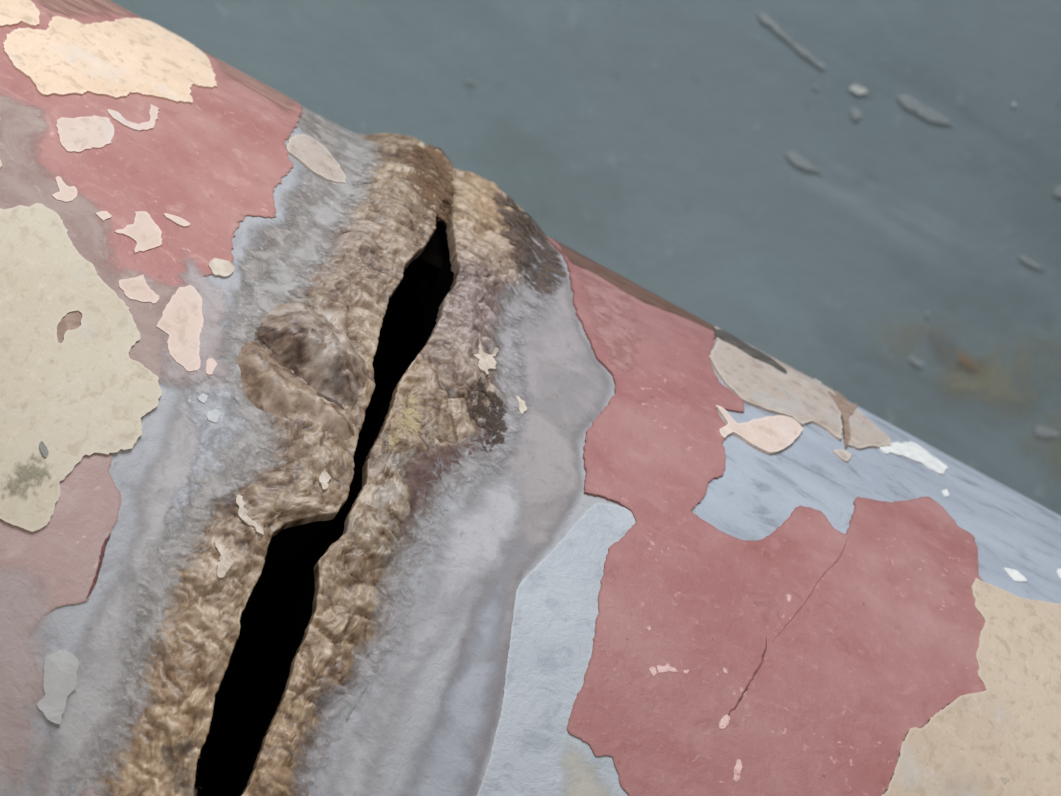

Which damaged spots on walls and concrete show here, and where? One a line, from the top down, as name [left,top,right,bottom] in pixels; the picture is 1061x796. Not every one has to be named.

damp [5,441,50,497]
peeling [0,0,346,792]
damp [35,105,384,796]
crack [238,387,396,796]
crack [388,201,453,363]
damp [295,229,609,796]
spalling [467,333,527,453]
peeling [477,236,1061,796]
crack [728,539,847,716]